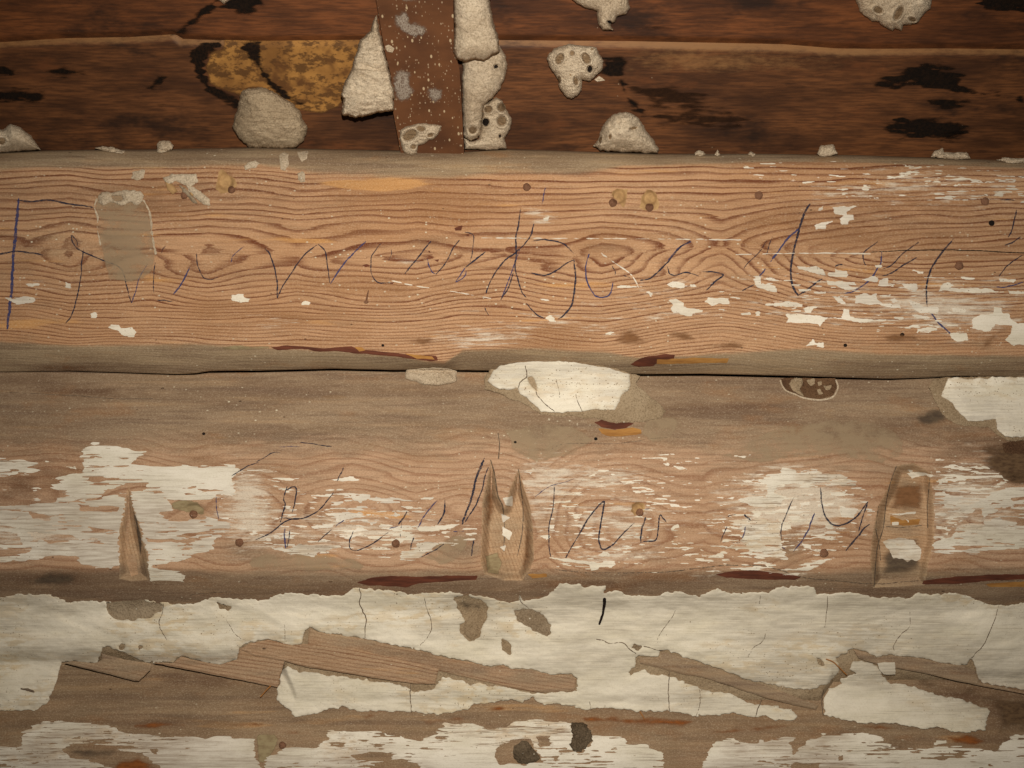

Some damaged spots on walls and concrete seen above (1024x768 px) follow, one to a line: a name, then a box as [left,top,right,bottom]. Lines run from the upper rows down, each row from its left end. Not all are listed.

peeling [744,163,1024,229]
peeling [667,281,740,316]
peeling [741,265,1024,346]
peeling [0,442,477,582]
peeling [500,496,513,551]
peeling [540,454,875,575]
peeling [883,459,1024,562]
flaking render [107,599,162,621]
flaking render [454,595,488,641]
flaking render [514,609,551,636]
peeling [0,719,664,768]
peeling [702,733,1024,768]